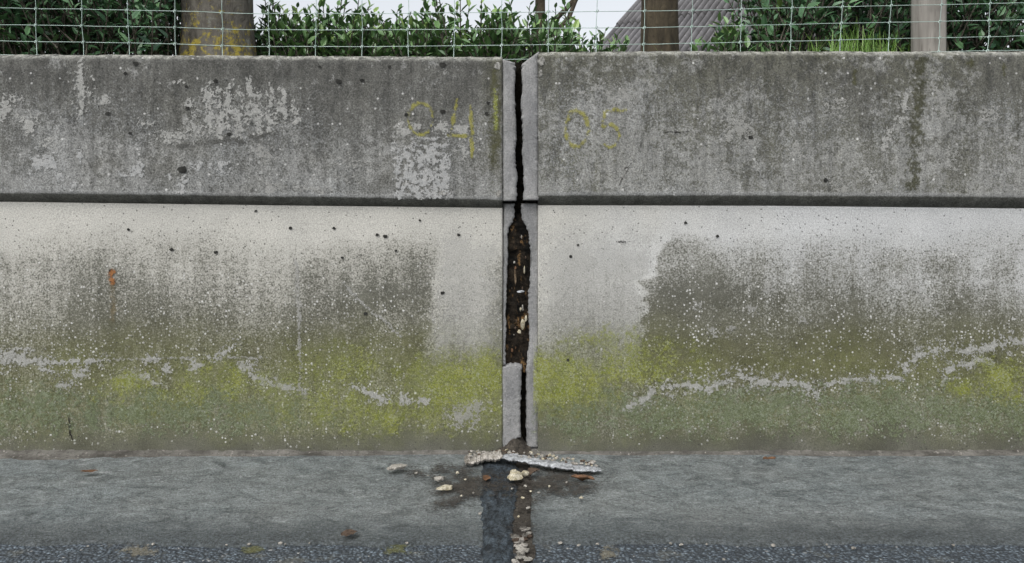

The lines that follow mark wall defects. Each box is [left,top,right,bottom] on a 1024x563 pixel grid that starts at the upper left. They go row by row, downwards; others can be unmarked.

crack [502,62,531,441]
water stain [0,259,309,399]
water stain [348,382,431,407]
water stain [442,398,492,430]
water stain [622,330,1024,412]